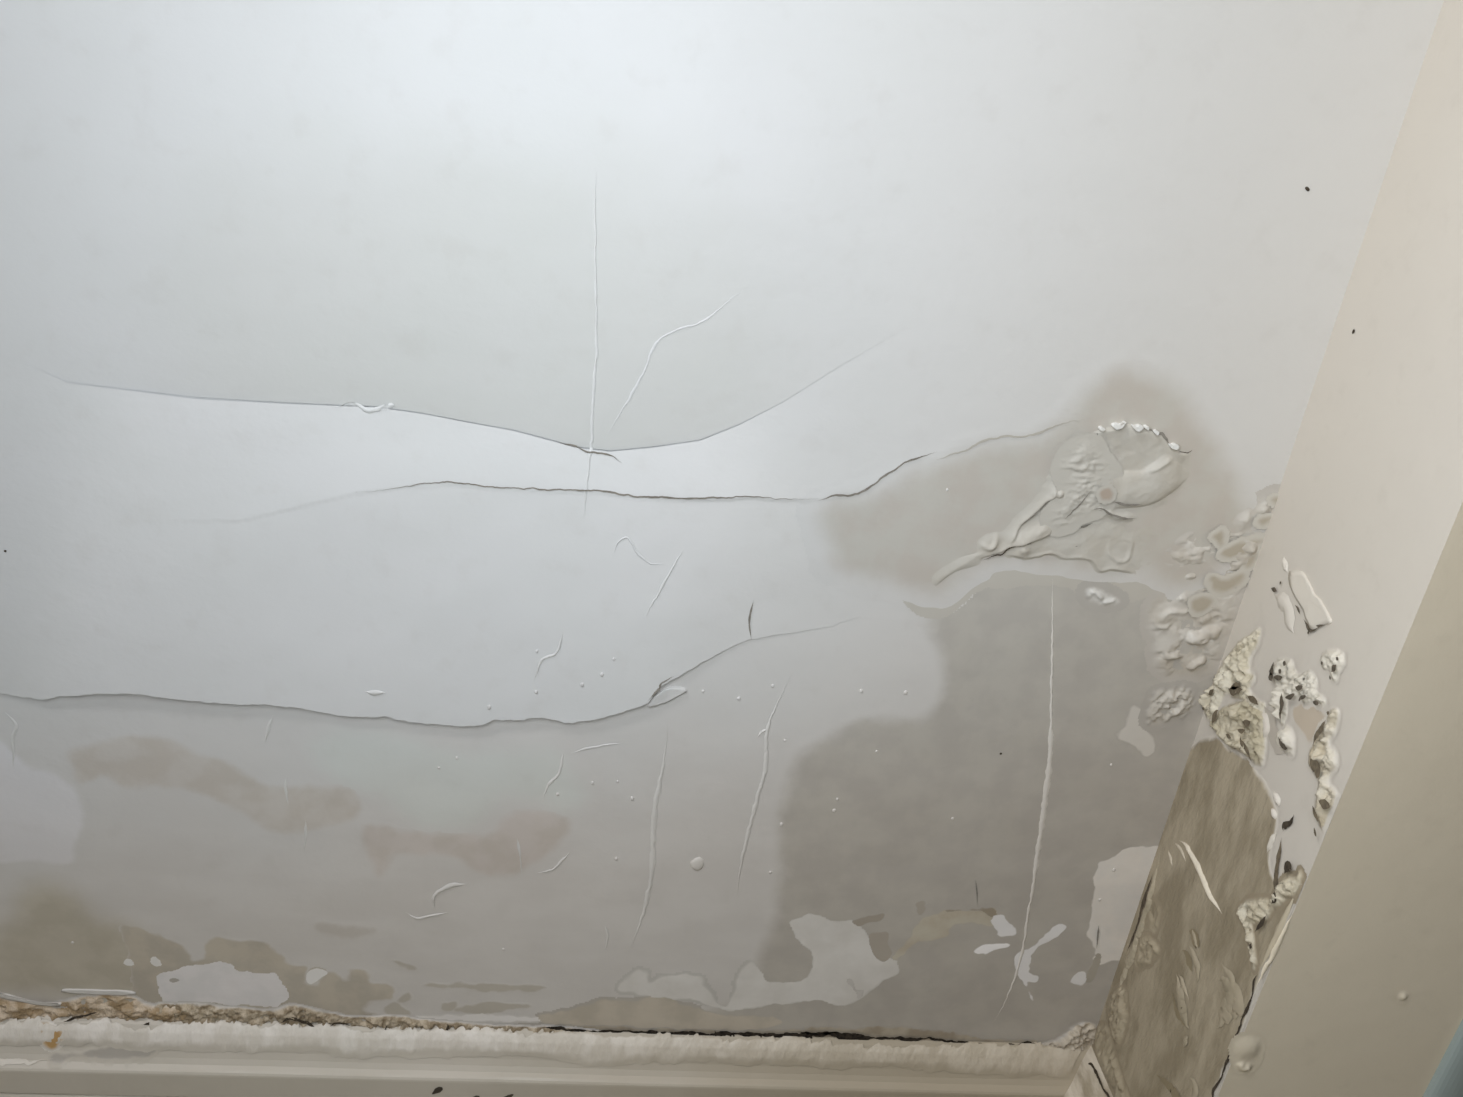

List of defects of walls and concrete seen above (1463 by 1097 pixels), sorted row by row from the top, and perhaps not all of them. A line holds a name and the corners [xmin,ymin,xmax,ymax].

crack [365,419,1083,500]
crack [746,604,754,636]
peeling [1271,557,1332,634]
water stain [0,344,1267,1045]
flaking render [1037,624,1348,1097]
peeling [974,914,1067,1001]
spalling [0,989,601,1033]